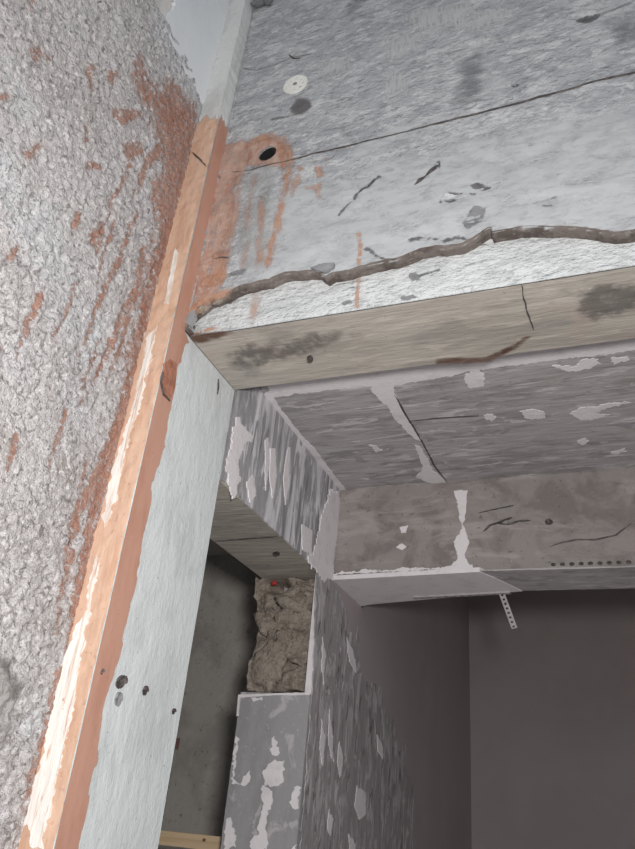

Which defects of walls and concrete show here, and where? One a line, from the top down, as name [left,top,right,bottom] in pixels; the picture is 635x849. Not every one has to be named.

crack [235,71,635,172]
crack [338,176,381,216]
crack [414,161,441,185]
crack [185,225,635,336]
rust [3,433,19,479]
rust [17,56,323,849]
flaking render [225,417,291,505]
crack [394,394,478,482]
crack [479,505,531,532]
flaking render [236,338,635,849]
flaking render [231,736,251,786]
flaking render [223,817,236,849]